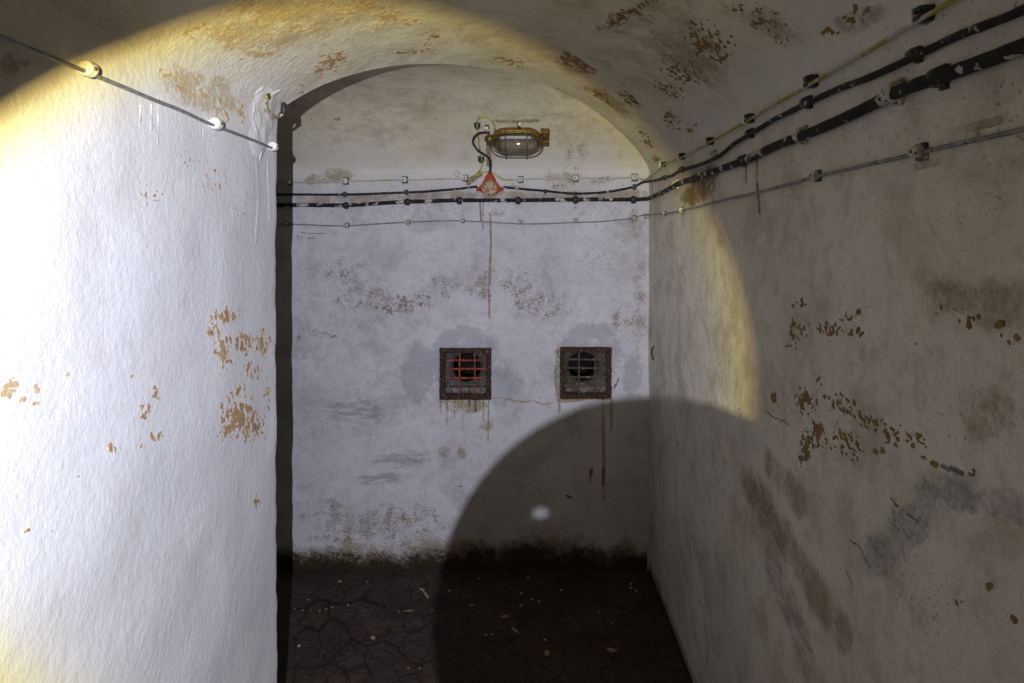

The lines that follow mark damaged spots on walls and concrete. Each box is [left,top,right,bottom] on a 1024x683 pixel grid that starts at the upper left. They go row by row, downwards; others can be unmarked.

peeling [158,68,248,123]
peeling [654,19,737,137]
corrosion [326,202,571,320]
peeling [781,297,870,356]
peeling [0,377,40,406]
peeling [206,306,271,449]
corrosion [439,400,489,440]
crack [494,397,556,408]
corrosion [555,349,613,500]
peeling [795,372,938,468]
water stain [276,539,693,683]